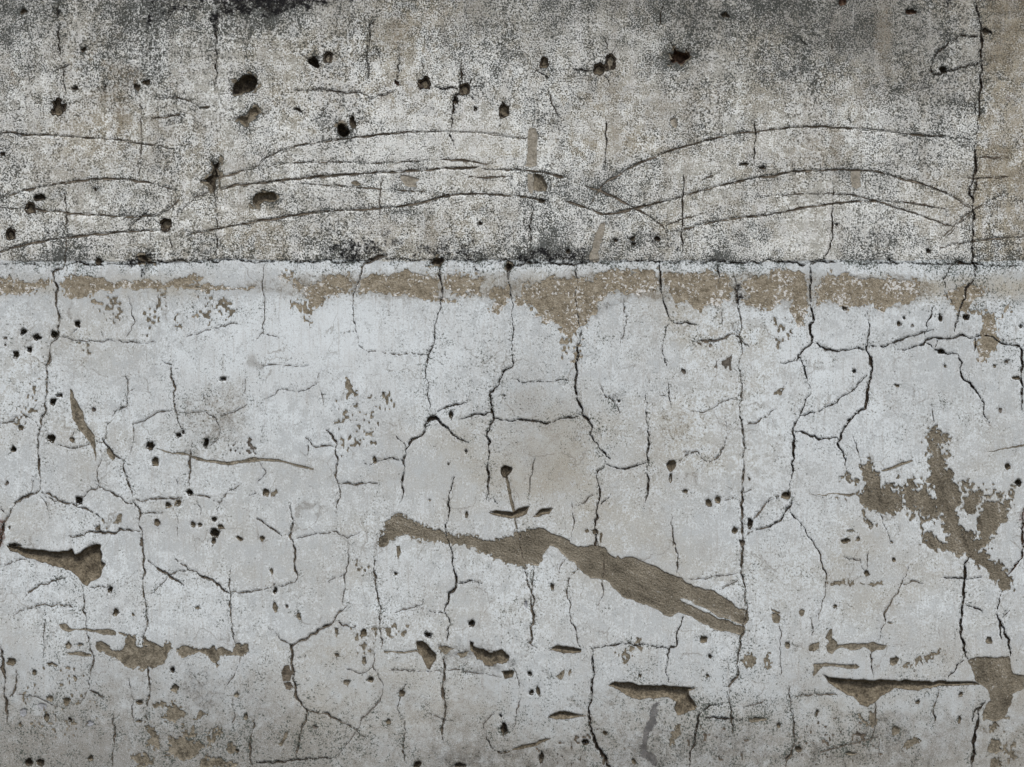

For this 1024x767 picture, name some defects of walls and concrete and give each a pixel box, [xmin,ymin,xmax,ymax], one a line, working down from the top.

crack [136,96,144,182]
flaking render [278,222,921,363]
crack [620,3,1024,767]
spalling [7,544,106,586]
crack [0,184,650,766]
flaking render [377,466,749,643]
flaking render [809,424,1017,592]
flaking render [30,623,249,738]
flaking render [350,623,515,679]
crack [559,559,684,767]
spalling [609,682,710,746]
flaking render [795,629,1024,767]